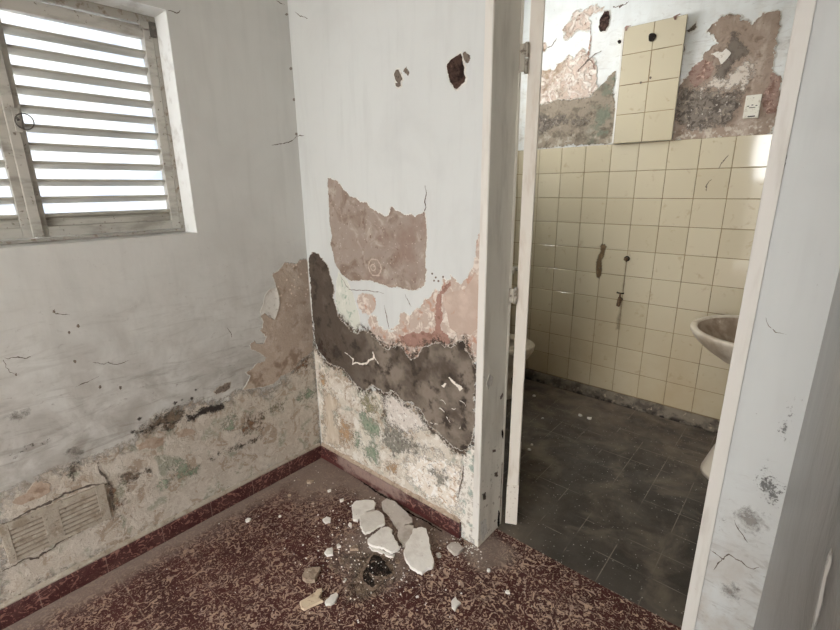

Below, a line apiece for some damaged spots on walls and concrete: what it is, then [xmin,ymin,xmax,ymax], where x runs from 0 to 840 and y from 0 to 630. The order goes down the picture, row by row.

spalling [393,67,409,89]
spalling [446,51,470,91]
flaking render [537,3,616,149]
flaking render [670,9,784,141]
rust [596,244,606,278]
water stain [130,389,284,461]
flaking render [0,177,488,603]
crack [712,551,759,570]